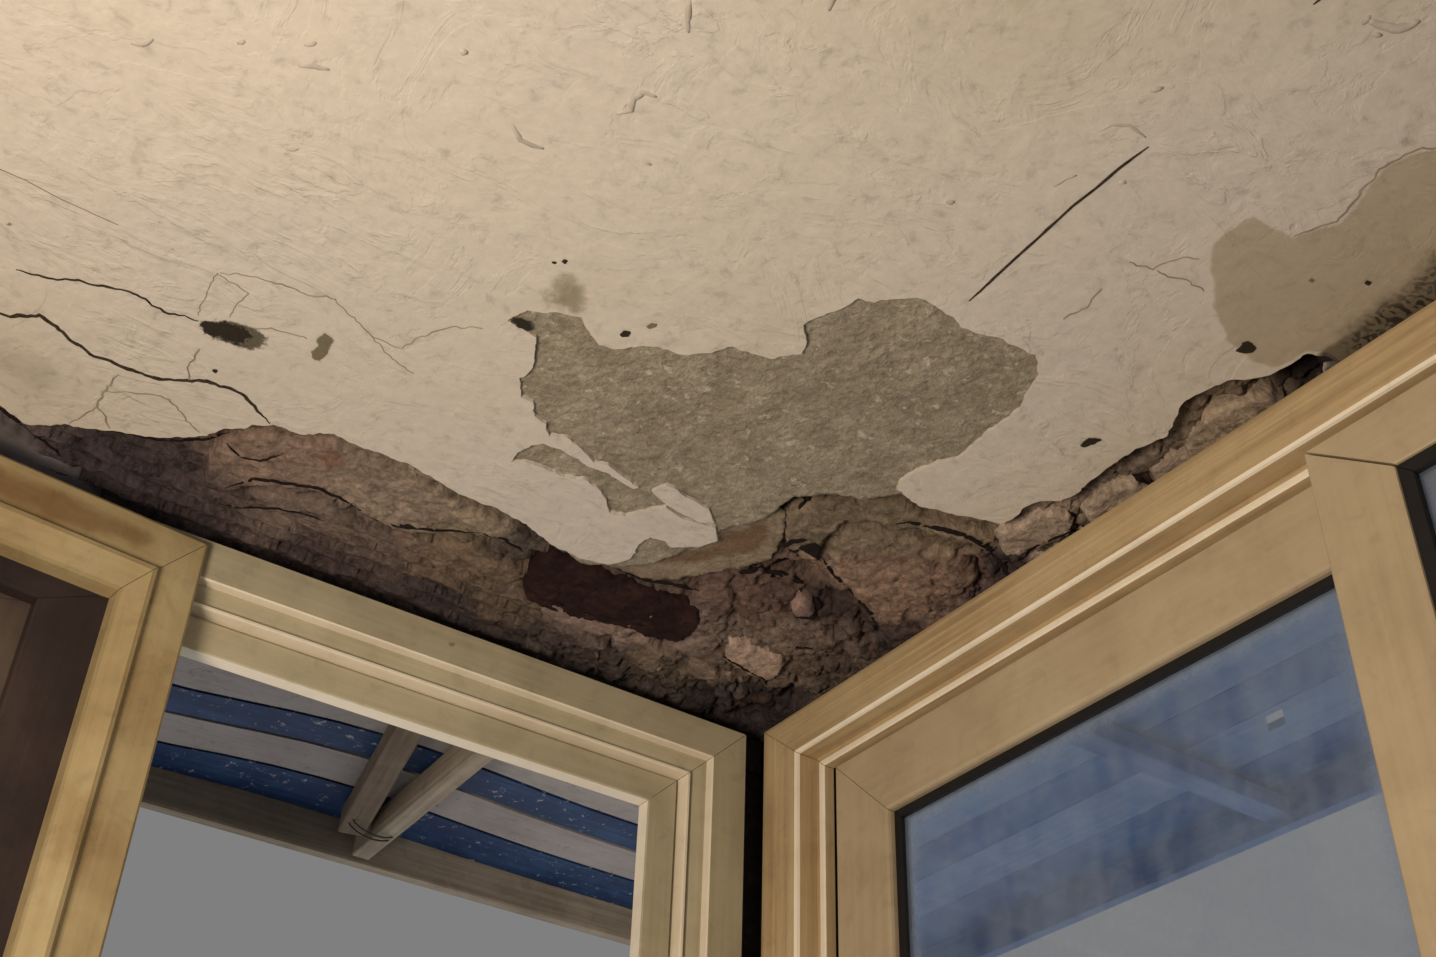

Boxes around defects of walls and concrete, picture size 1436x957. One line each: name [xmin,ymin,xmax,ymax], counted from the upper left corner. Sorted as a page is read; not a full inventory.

crack [0,269,483,433]
leakage [1321,267,1436,370]
spalling [0,298,1324,744]